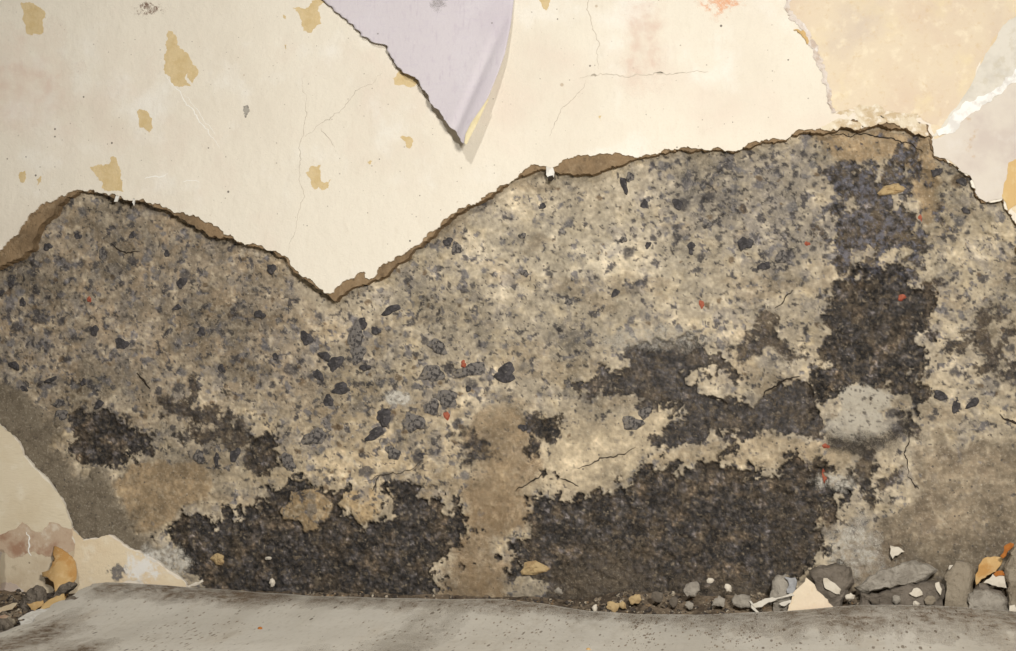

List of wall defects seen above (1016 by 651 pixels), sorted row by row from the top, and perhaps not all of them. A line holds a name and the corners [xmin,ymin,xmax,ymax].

spalling [283,0,325,33]
spalling [393,70,418,87]
flaking render [0,104,1016,611]
efflorescence [808,473,863,493]
water stain [434,409,545,597]
peeling [0,603,17,625]